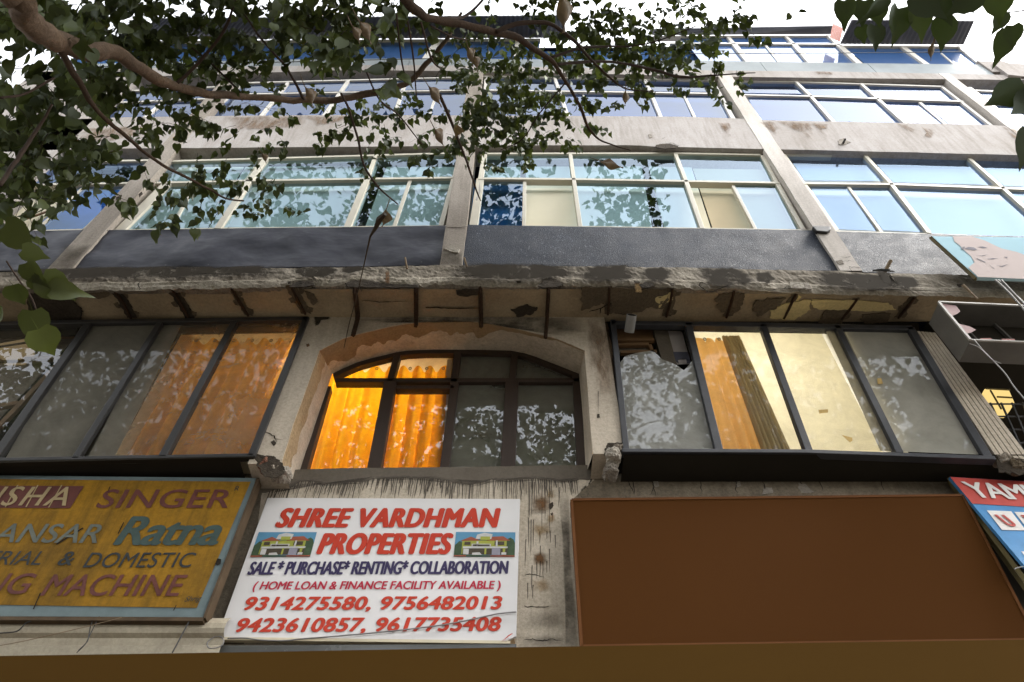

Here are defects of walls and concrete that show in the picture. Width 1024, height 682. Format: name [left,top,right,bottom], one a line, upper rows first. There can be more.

spalling [285,280,318,315]
spalling [345,280,419,289]
peeling [456,288,479,297]
peeling [580,282,681,318]
peeling [714,281,919,321]
peeling [254,304,583,484]
spalling [602,442,623,482]
corrosion [535,497,547,510]
leakage [265,477,595,617]